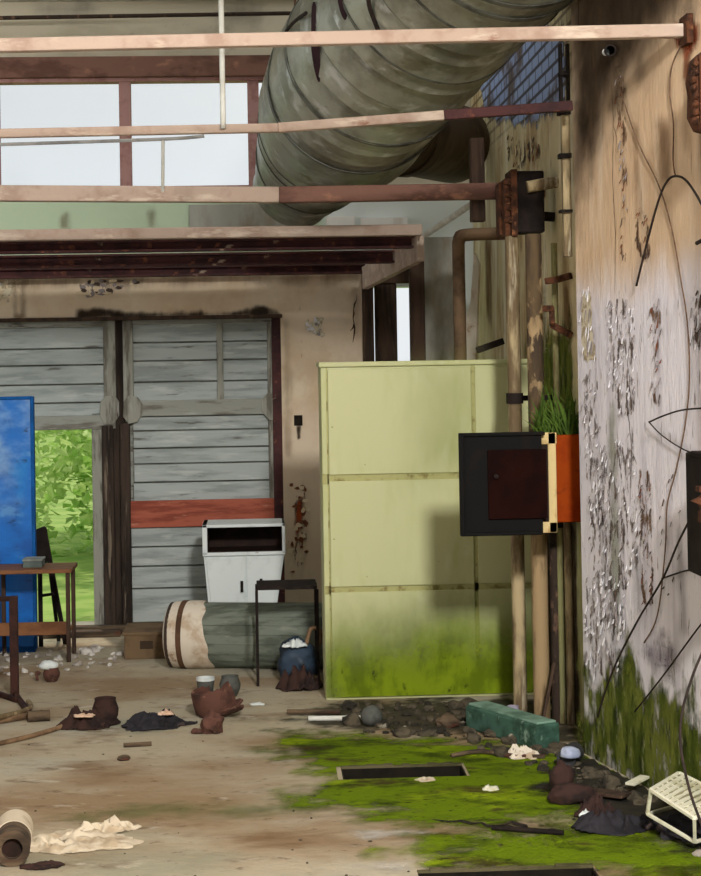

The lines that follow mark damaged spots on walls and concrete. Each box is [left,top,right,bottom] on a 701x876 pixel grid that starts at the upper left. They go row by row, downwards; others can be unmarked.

peeling [75,279,140,298]
peeling [690,290,701,353]
peeling [579,287,681,682]
spalling [287,483,311,573]
damp [308,697,467,739]
damp [531,769,553,791]
damp [550,699,676,817]